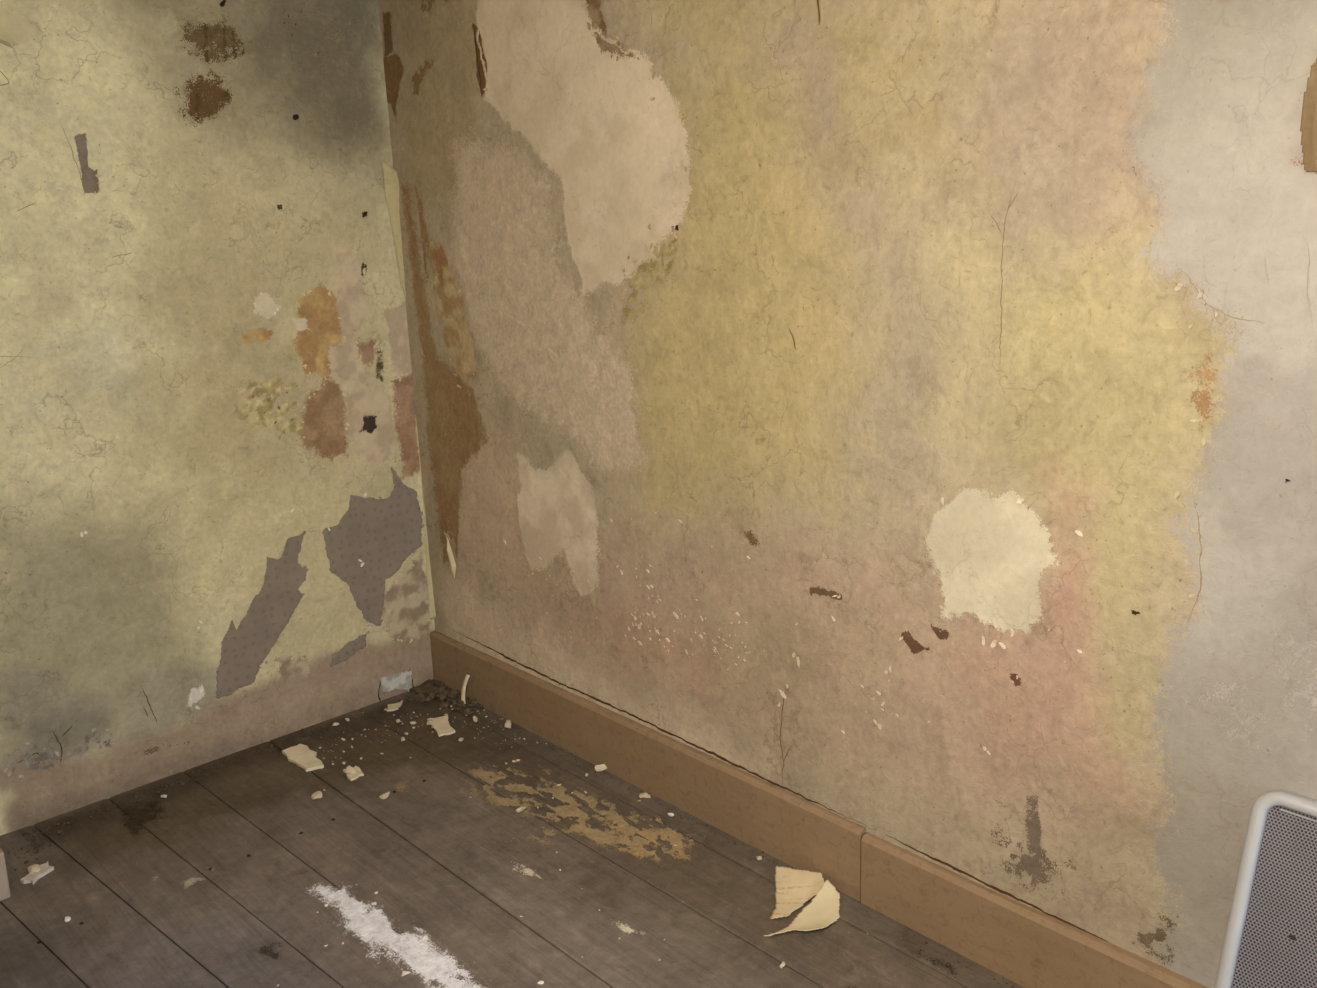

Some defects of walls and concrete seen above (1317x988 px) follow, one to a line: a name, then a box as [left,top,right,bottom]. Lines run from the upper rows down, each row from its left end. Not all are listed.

damp [173,1,253,127]
damp [271,0,434,120]
peeling [74,133,101,195]
flaking render [472,0,692,323]
flaking render [229,161,436,645]
peeling [444,532,456,578]
flaking render [514,447,765,665]
flaking render [899,485,1064,654]
flaking render [1107,0,1317,988]
flaking render [258,652,312,682]
flaking render [378,670,414,701]
damp [988,795,1079,899]